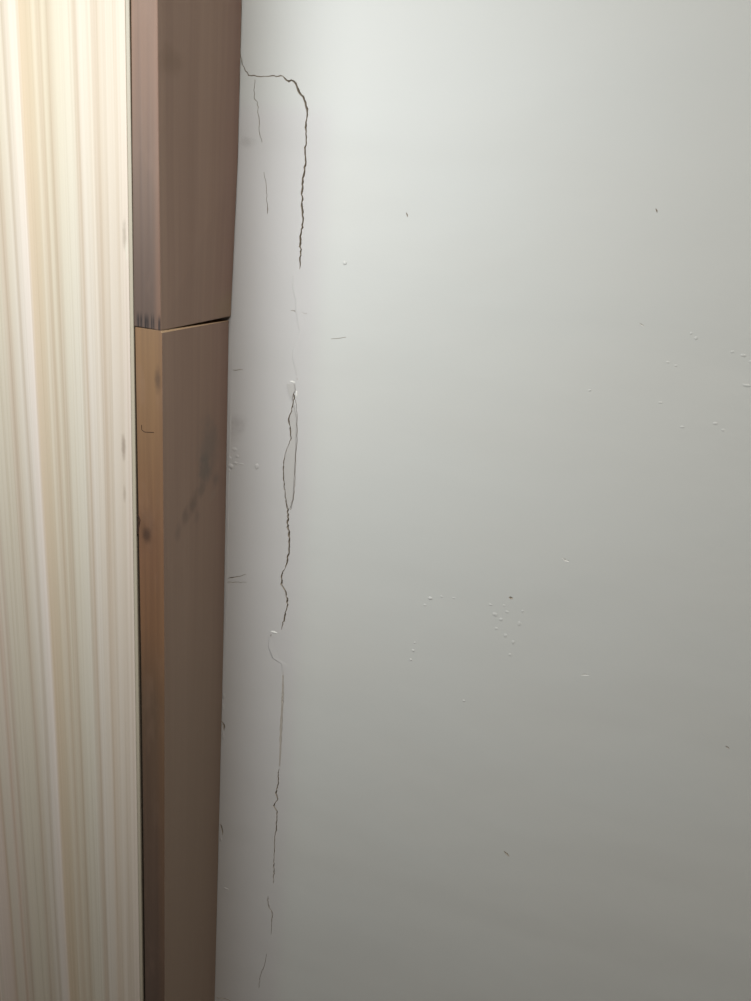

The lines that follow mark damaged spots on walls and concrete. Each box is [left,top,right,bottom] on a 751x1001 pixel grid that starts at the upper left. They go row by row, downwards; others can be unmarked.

crack [240,54,308,269]
crack [271,374,298,634]
crack [267,675,284,931]